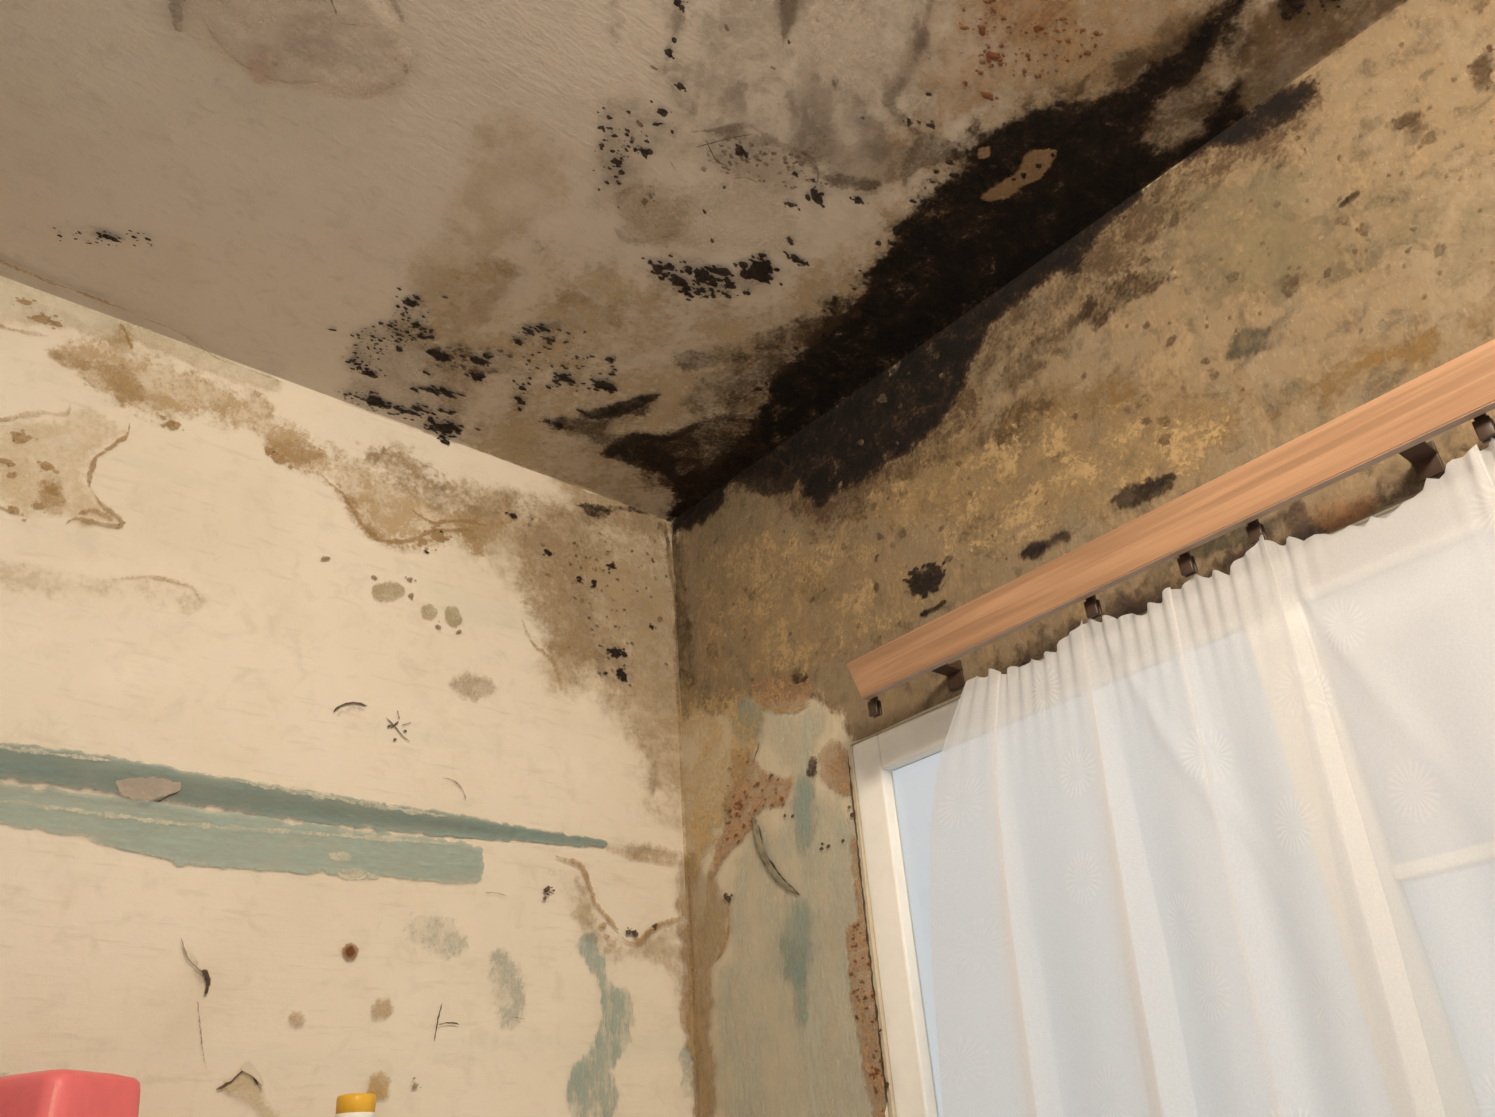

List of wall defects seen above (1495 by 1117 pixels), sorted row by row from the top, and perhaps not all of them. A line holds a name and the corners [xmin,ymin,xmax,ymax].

water stain [13,297,63,329]
water stain [54,325,273,430]
water stain [0,417,38,443]
water stain [0,426,130,529]
water stain [265,426,327,472]
water stain [323,0,1495,1117]
spalling [116,776,181,802]
flaking render [708,741,889,1117]
peeling [181,939,211,1068]